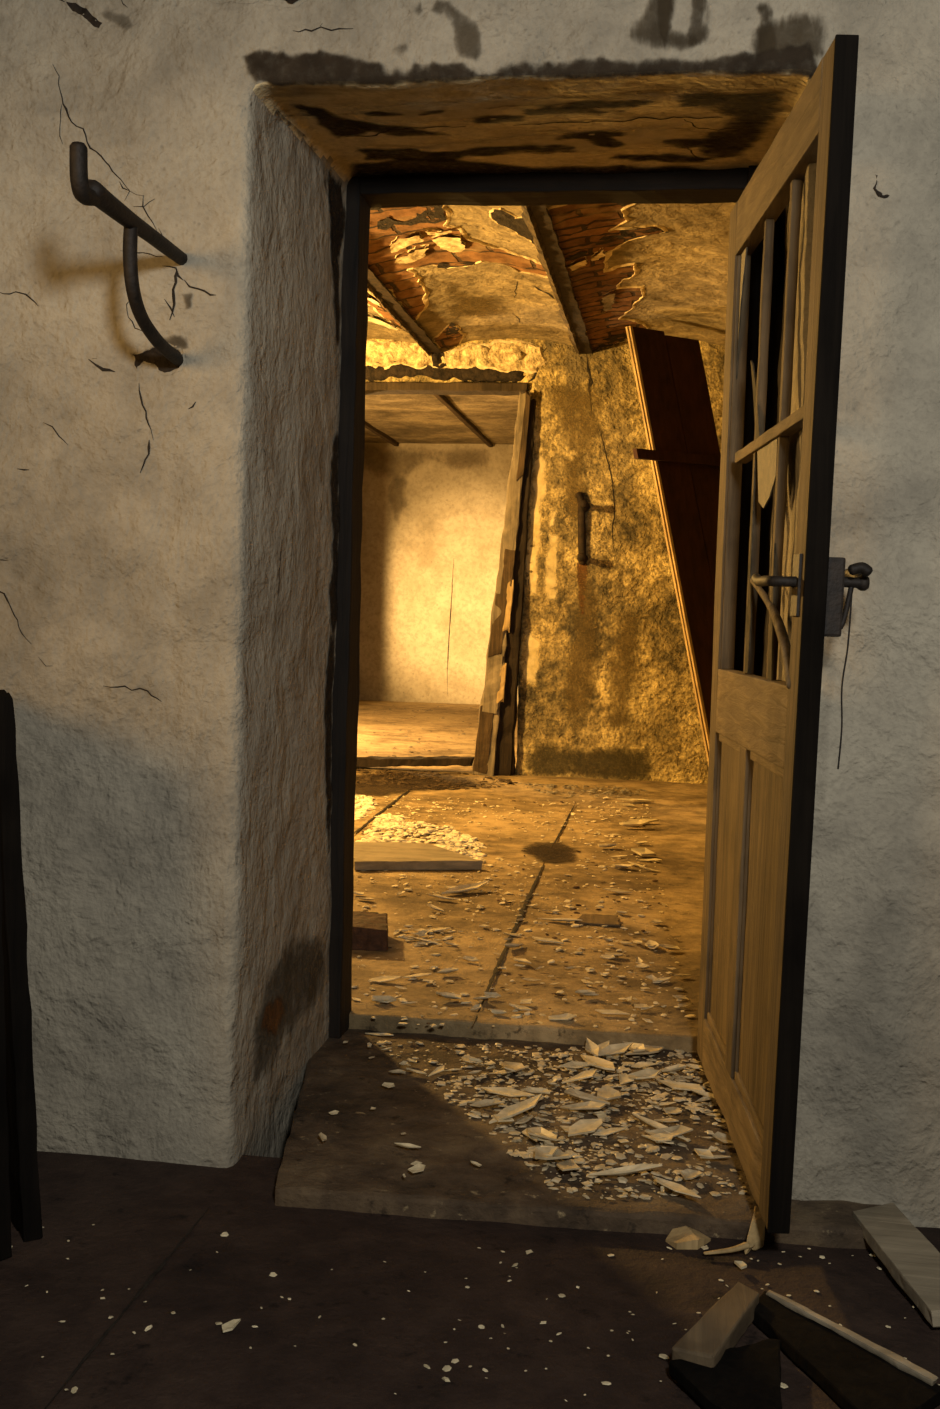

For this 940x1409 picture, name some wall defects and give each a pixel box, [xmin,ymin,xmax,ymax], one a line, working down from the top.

water stain [245,0,823,86]
crack [53,65,214,331]
spalling [365,205,548,383]
water stain [277,92,782,343]
spalling [547,203,669,350]
crack [0,559,46,666]
crack [105,685,161,701]
water stain [523,842,578,863]
water stain [255,942,323,1080]